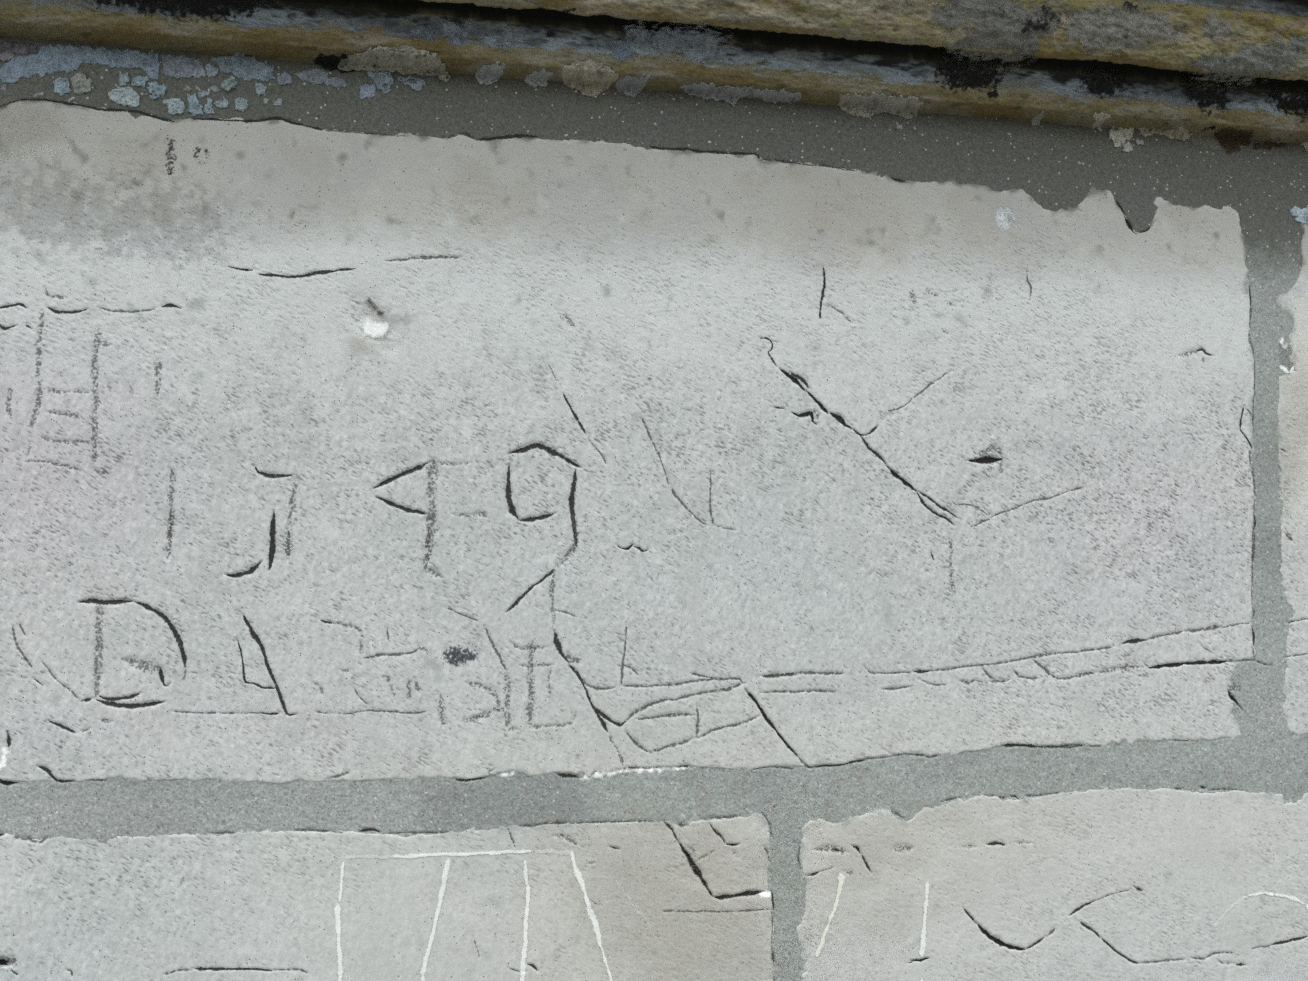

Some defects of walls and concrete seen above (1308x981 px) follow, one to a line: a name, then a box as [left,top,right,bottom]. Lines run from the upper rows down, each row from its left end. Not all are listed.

crack [780,369,957,524]